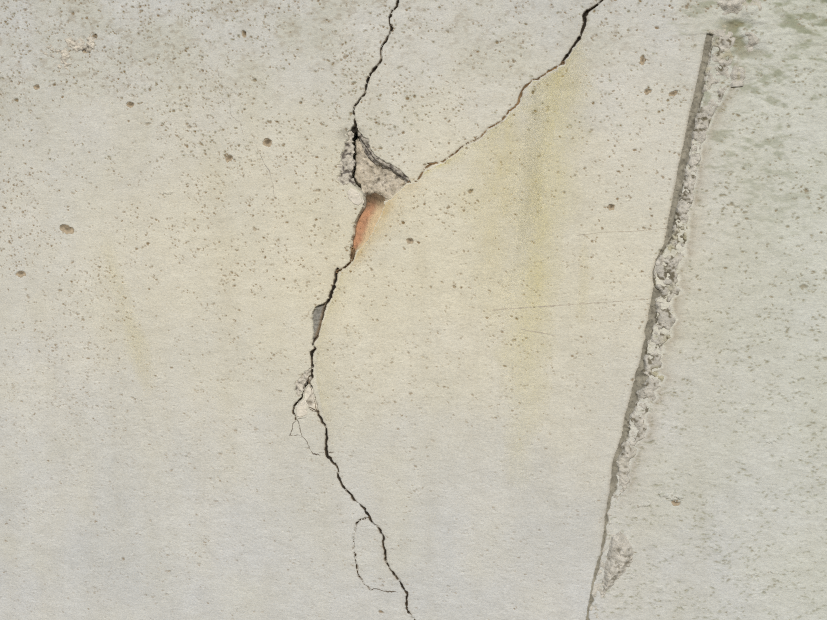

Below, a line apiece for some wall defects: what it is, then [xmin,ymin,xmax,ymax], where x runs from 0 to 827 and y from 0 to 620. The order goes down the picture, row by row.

crack [351,0,399,133]
crack [407,0,603,183]
spalling [337,131,409,260]
crack [323,247,355,311]
crack [289,332,415,620]